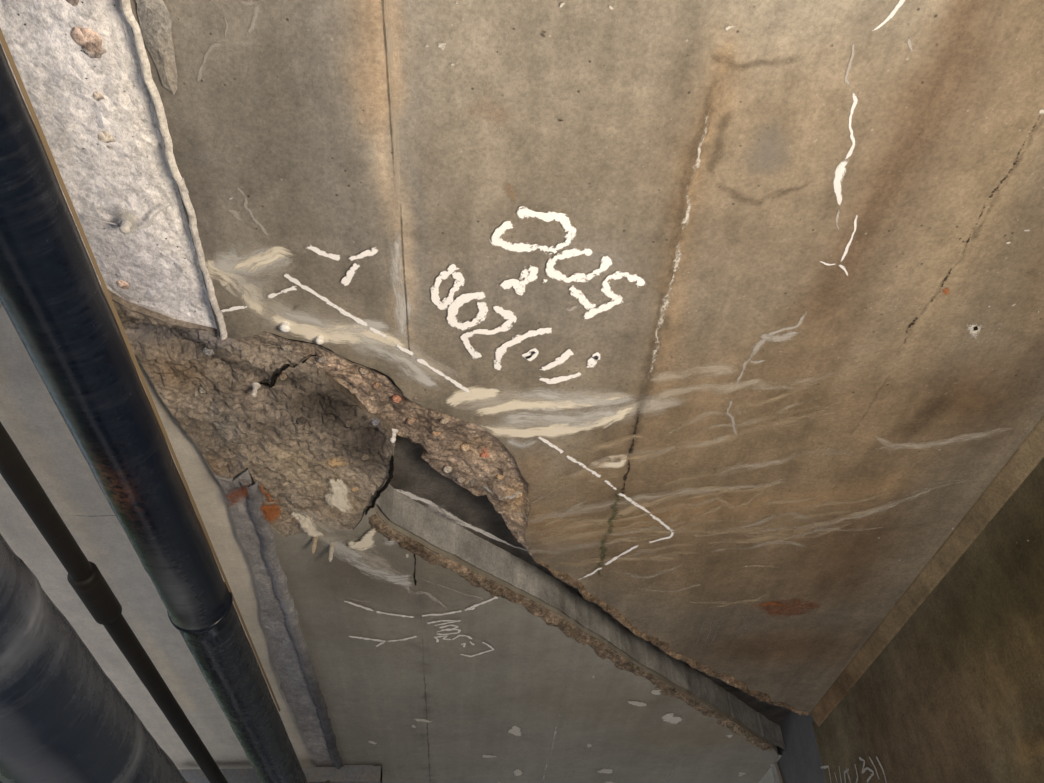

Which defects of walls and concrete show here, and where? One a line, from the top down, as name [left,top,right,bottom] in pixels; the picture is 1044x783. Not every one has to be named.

crack [259,333,403,393]
water stain [447,366,758,447]
water stain [558,435,653,482]
water stain [878,434,985,449]
spalling [101,280,809,783]
water stain [393,489,527,551]
water stain [527,479,894,568]